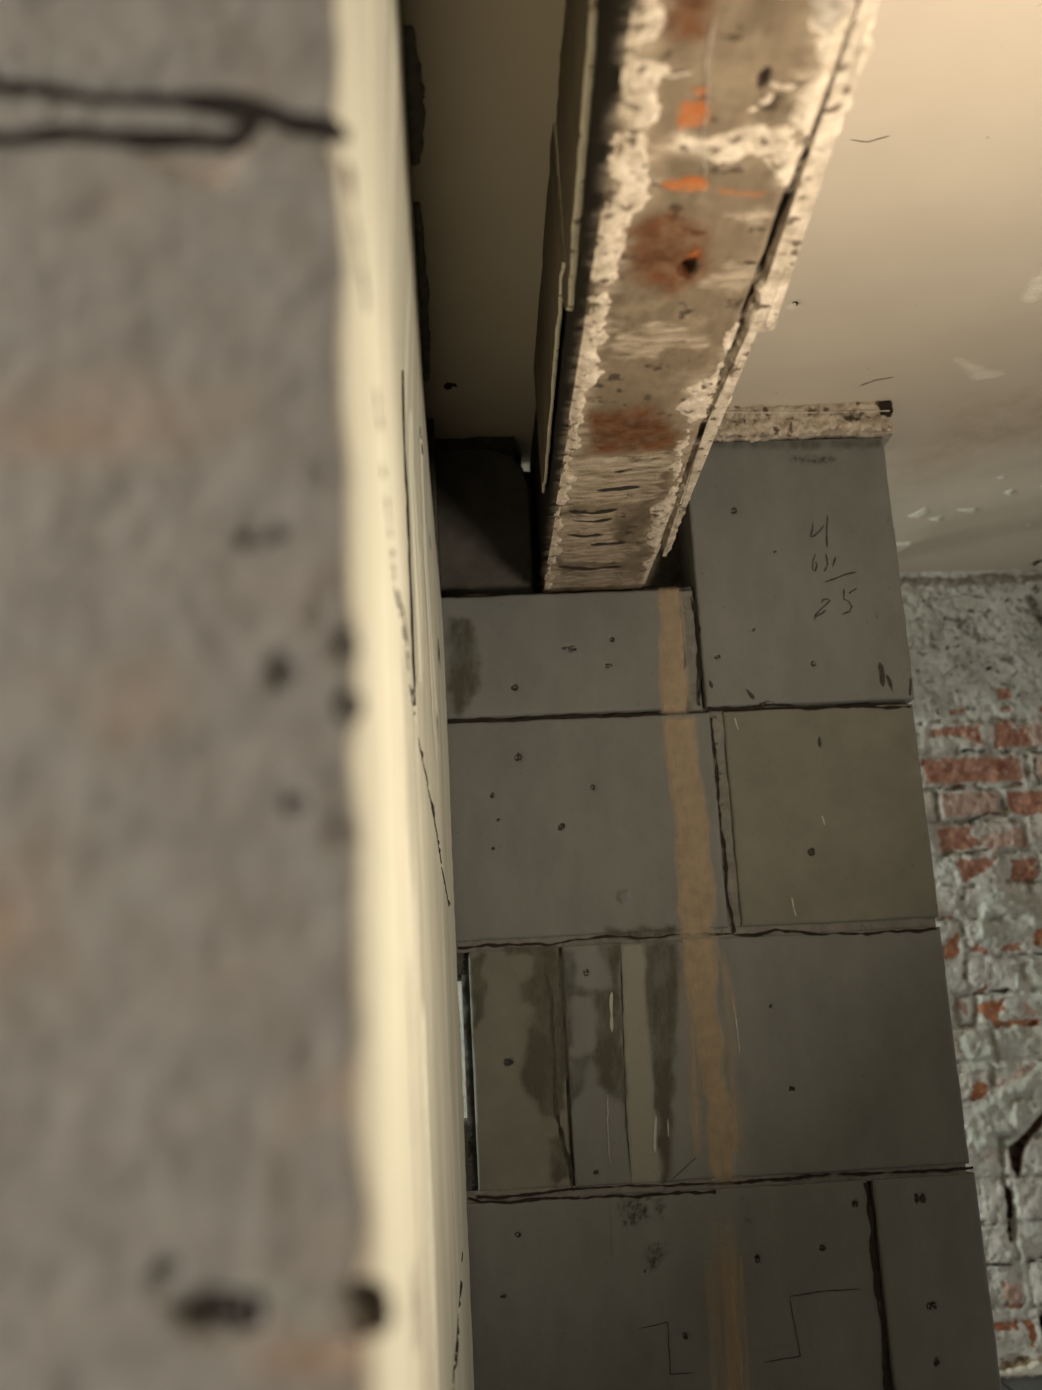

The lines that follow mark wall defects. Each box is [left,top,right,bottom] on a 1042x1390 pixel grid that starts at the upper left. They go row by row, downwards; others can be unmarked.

peeling [667,0,857,187]
peeling [544,0,740,590]
spalling [839,400,893,421]
flaking render [900,572,1042,590]
spalling [920,688,1042,883]
spalling [939,913,1042,959]
water stain [505,946,567,1114]
spalling [955,984,1040,1029]
spalling [969,1063,1037,1102]
spalling [1004,1113,1042,1241]
spalling [994,1281,1042,1348]